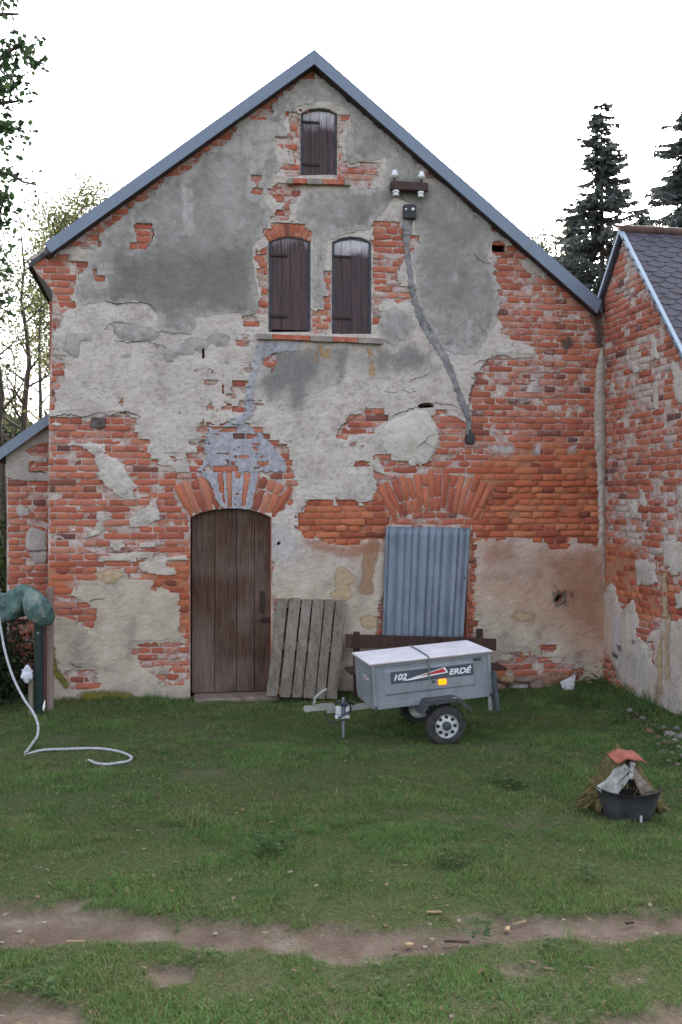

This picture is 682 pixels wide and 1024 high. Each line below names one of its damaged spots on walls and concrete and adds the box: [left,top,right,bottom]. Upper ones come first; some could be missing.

flaking render [31,71,605,686]
flaking render [650,335,682,404]
flaking render [628,488,647,518]
flaking render [635,540,682,586]
flaking render [64,668,101,693]